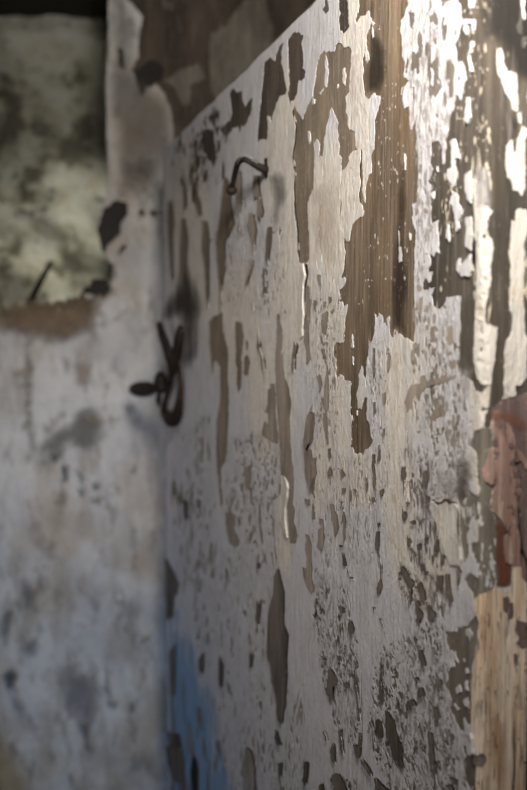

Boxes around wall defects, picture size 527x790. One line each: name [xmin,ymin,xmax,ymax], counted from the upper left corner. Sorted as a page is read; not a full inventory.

peeling [118,0,527,790]